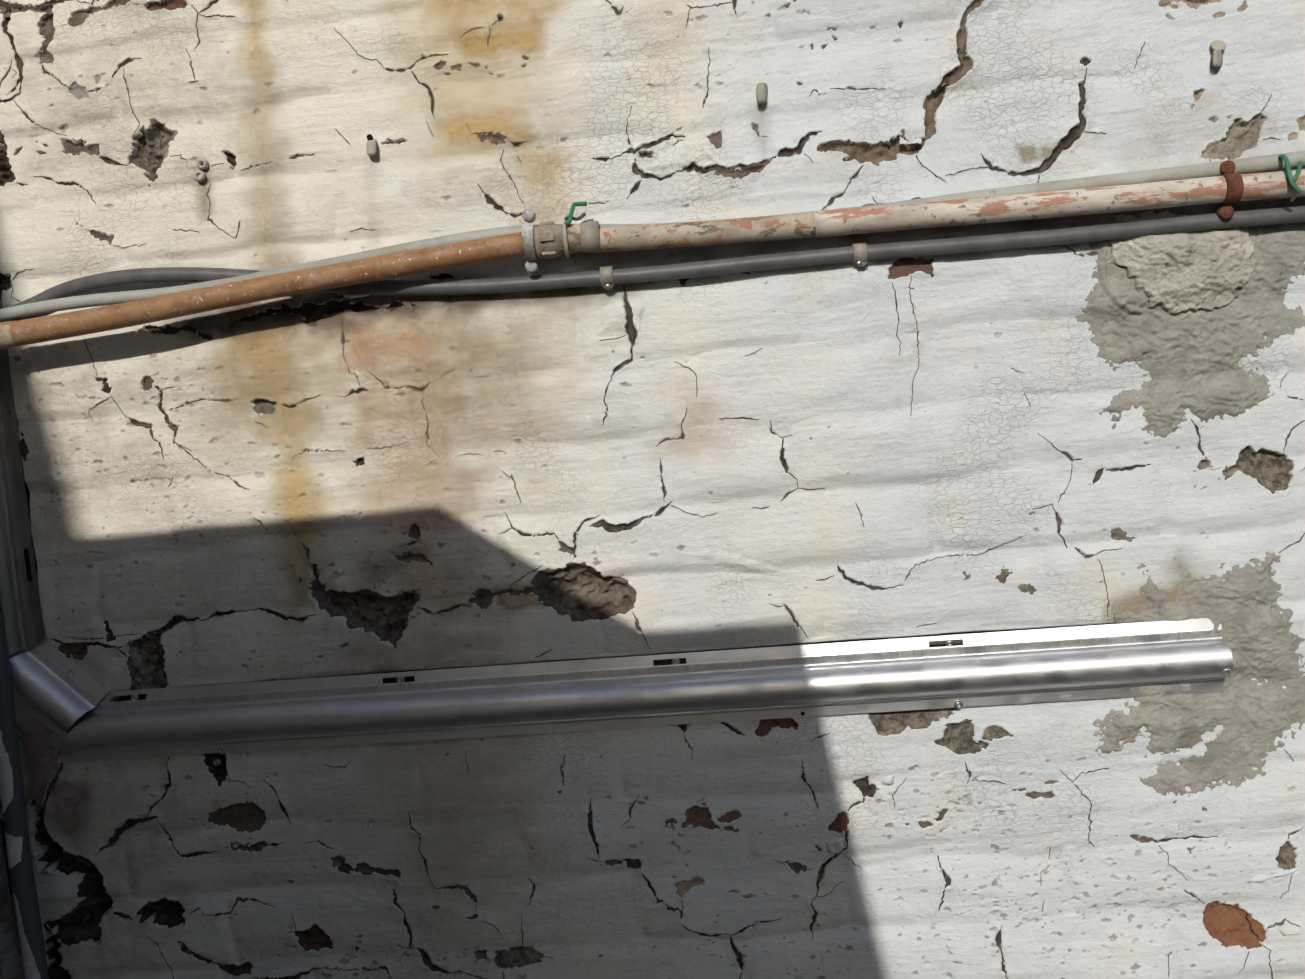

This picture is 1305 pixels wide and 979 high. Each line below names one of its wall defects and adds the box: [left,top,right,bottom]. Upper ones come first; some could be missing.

crack [0,0,142,136]
crack [941,0,984,86]
spalling [14,118,178,187]
crack [589,106,822,204]
crack [822,68,1106,210]
crack [277,326,717,587]
crack [719,417,824,510]
spalling [1196,446,1294,494]
spalling [309,564,420,648]
spalling [469,541,637,622]
flaking render [207,800,268,853]
flaking render [1203,901,1266,949]